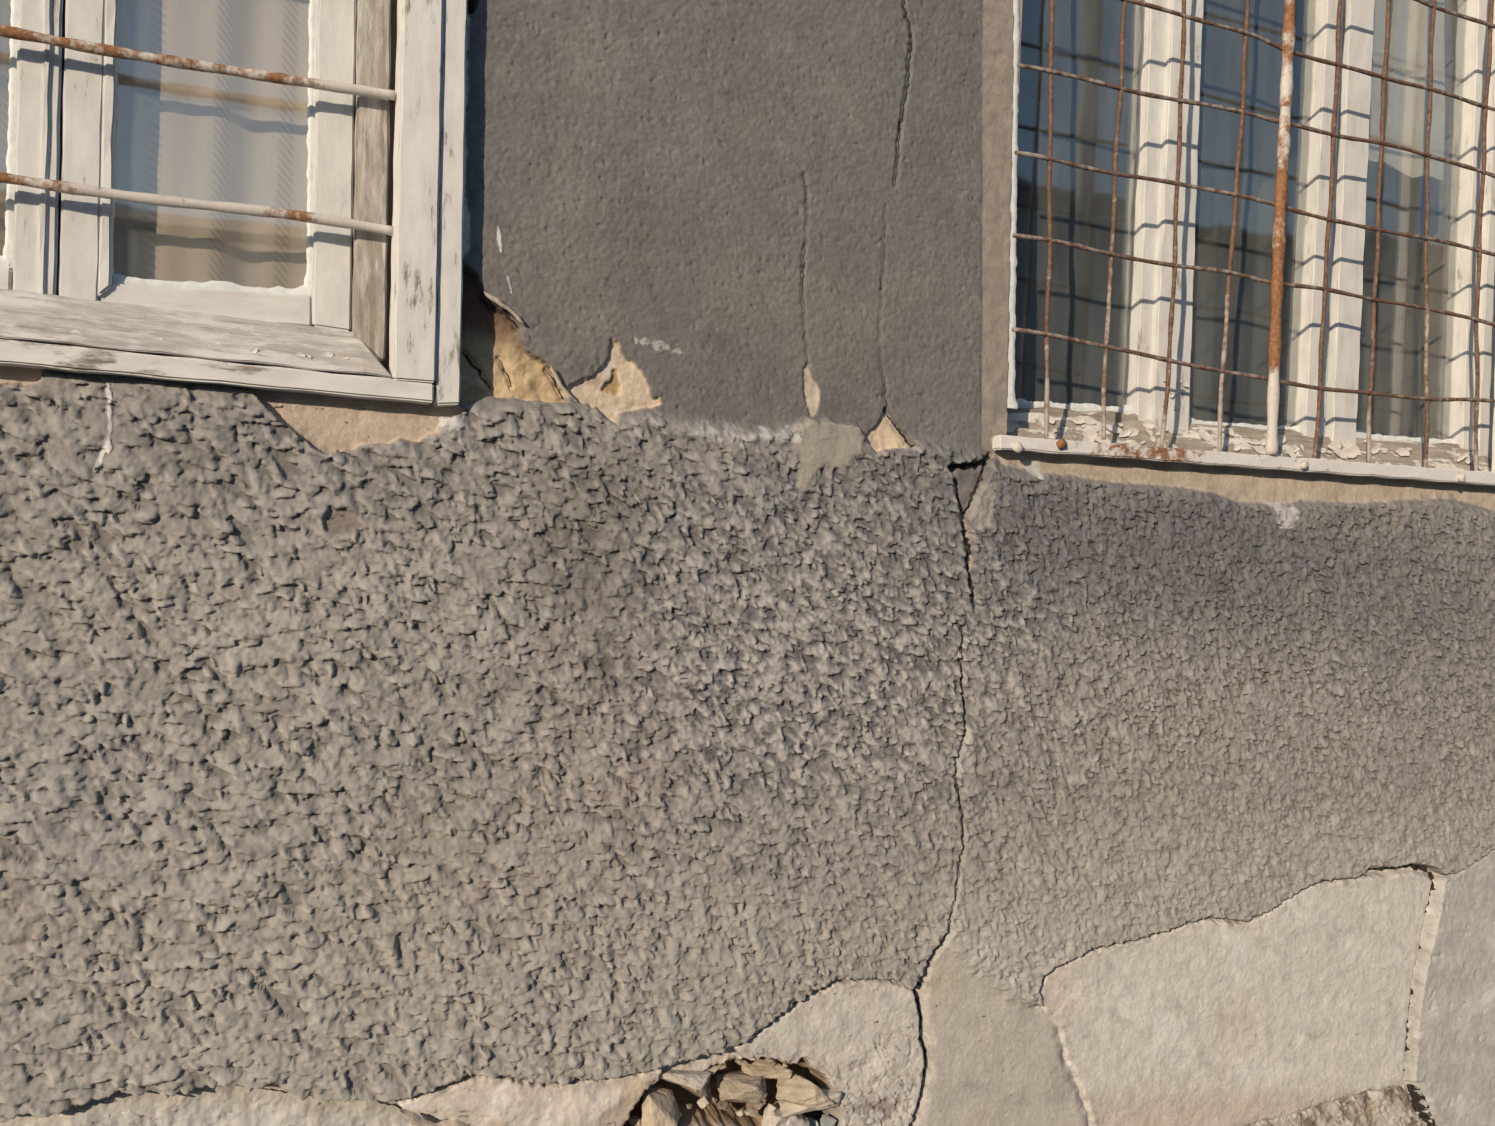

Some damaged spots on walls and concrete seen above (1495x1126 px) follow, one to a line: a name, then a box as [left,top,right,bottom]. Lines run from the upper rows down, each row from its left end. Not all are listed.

crack [879,0,912,324]
spalling [253,264,662,453]
peeling [803,366,821,416]
peeling [865,411,909,453]
crack [881,360,915,448]
crack [734,455,990,1126]
crack [1240,864,1436,1126]
spalling [395,1055,842,1126]